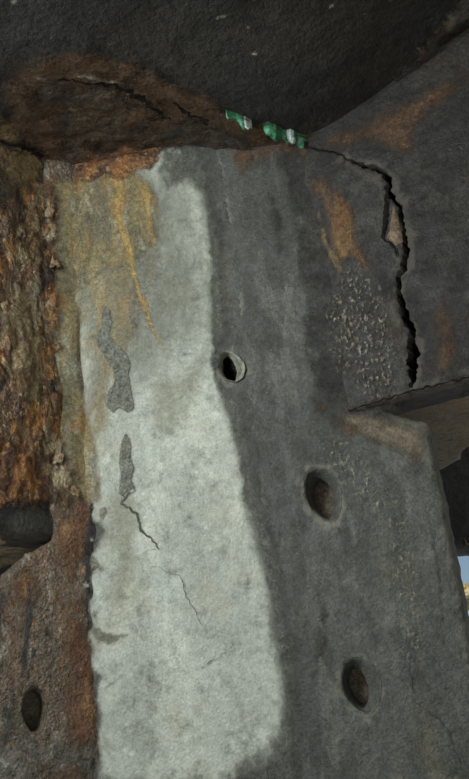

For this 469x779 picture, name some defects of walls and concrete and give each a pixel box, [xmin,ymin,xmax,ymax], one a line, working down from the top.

crack [0,139,44,159]
corrosion [0,51,316,743]
corrosion [316,180,364,265]
crack [304,141,469,412]